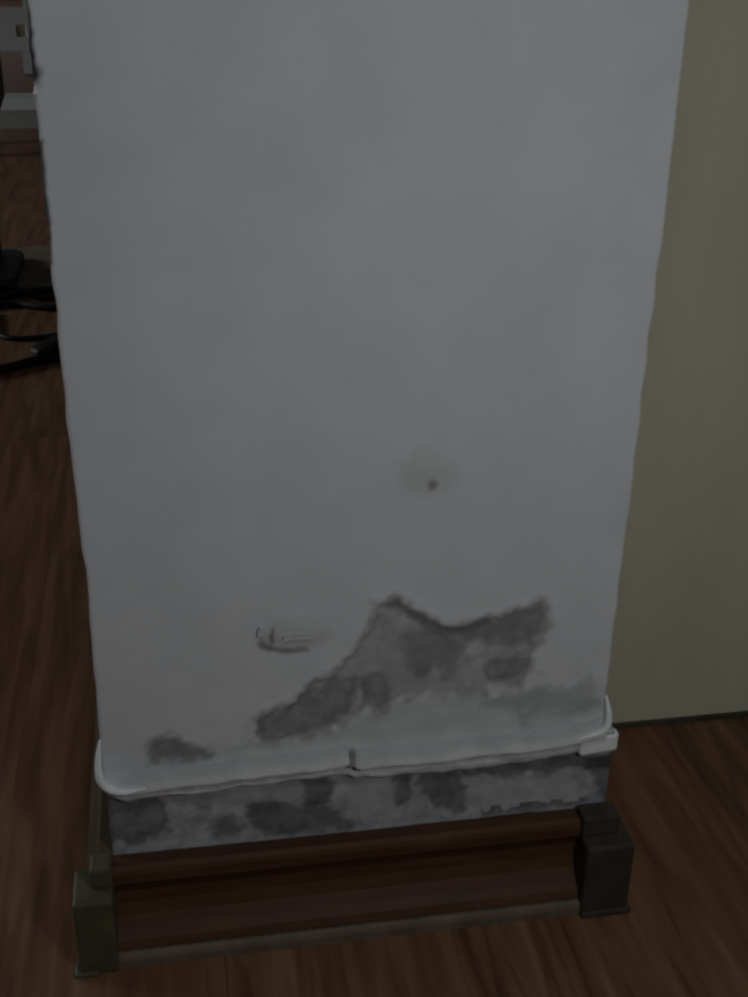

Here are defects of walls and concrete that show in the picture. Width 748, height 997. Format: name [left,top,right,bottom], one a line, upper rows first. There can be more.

spalling [95,694,618,855]